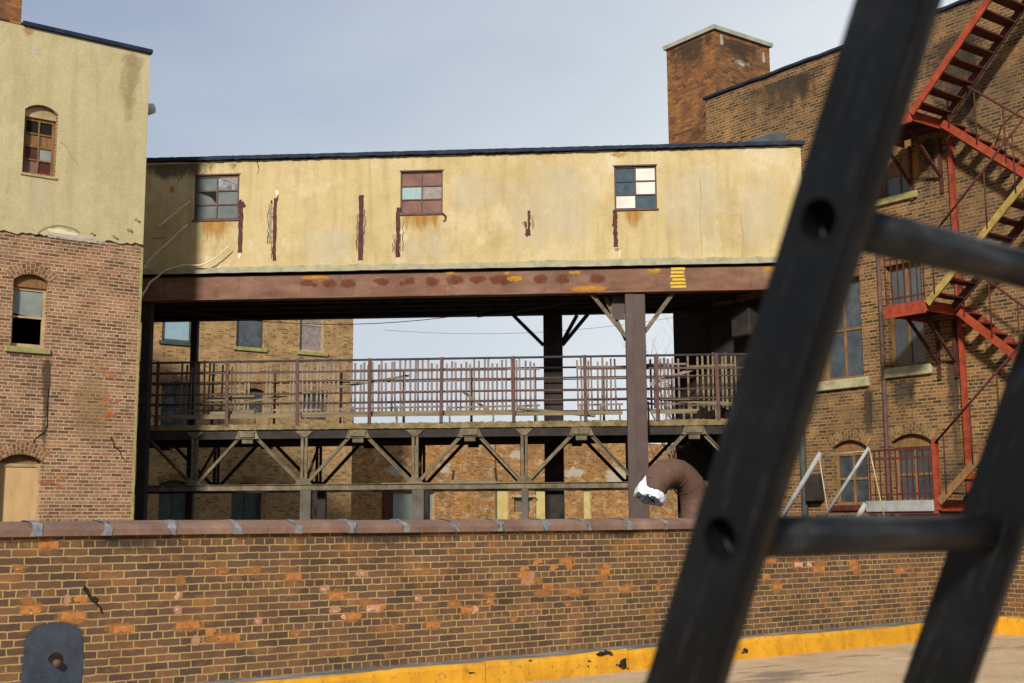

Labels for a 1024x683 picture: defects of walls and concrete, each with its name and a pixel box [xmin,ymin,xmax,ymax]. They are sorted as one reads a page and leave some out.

peeling [47,218,140,244]
corrosion [303,279,355,288]
corrosion [427,275,510,286]
crack [83,586,104,614]